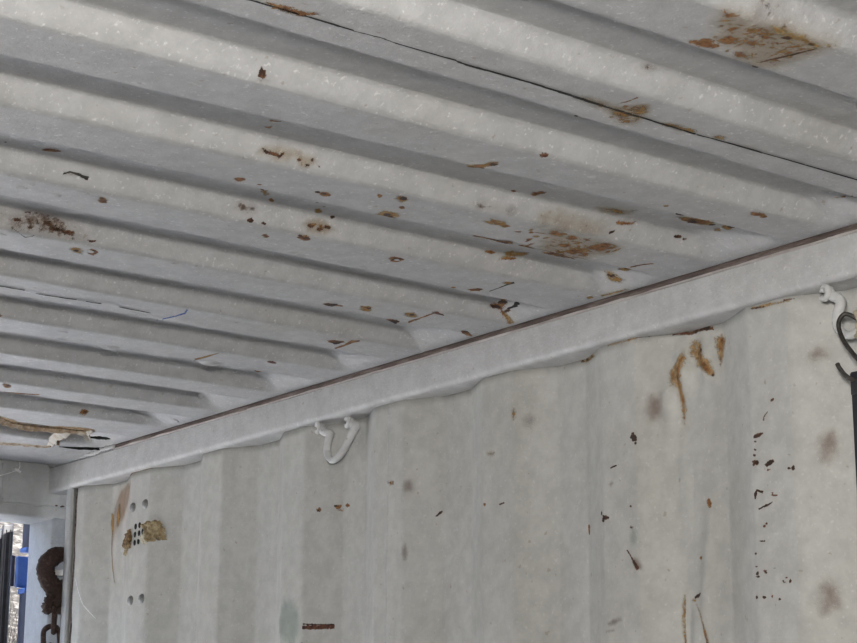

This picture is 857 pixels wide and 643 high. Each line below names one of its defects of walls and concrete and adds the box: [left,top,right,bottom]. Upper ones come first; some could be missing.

corrosion [689,9,830,68]
crack [249,0,857,180]
corrosion [599,97,647,123]
corrosion [12,212,98,256]
corrosion [297,191,335,241]
corrosion [377,196,408,218]
corrosion [474,209,635,260]
corrosion [670,326,725,419]